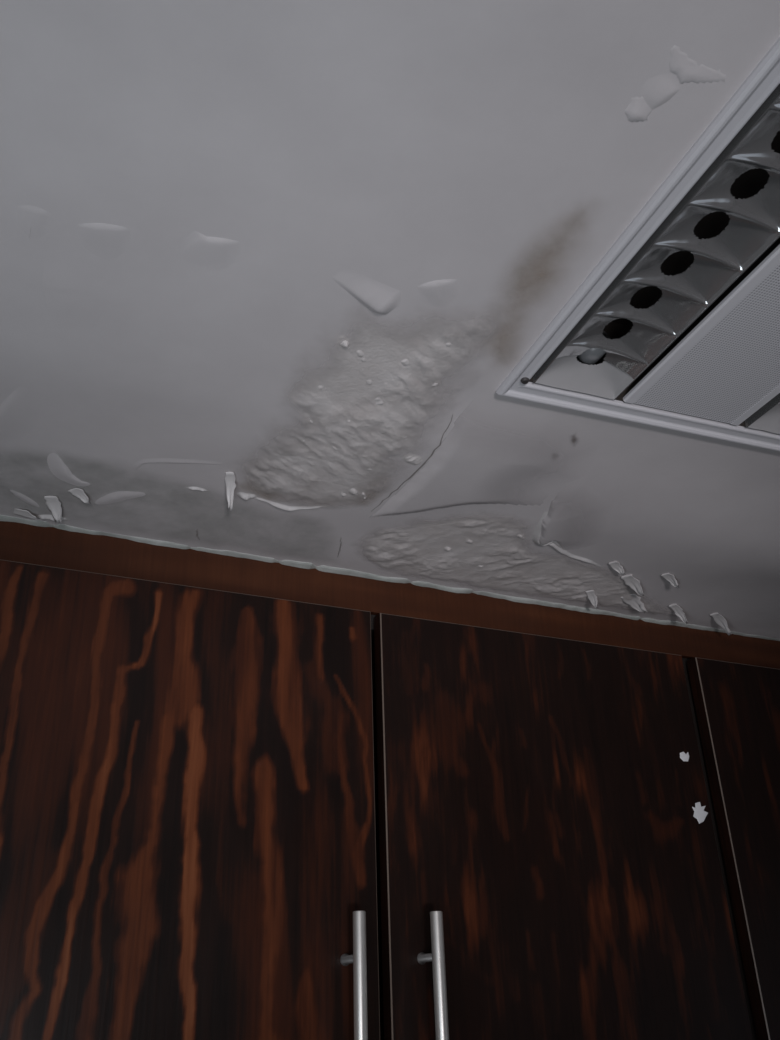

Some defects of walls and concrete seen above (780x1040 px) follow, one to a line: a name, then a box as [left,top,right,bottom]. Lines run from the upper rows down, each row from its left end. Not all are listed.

flaking render [248,319,490,511]
peeling [5,450,151,523]
crack [371,415,453,512]
peeling [669,604,688,624]
peeling [710,613,731,635]